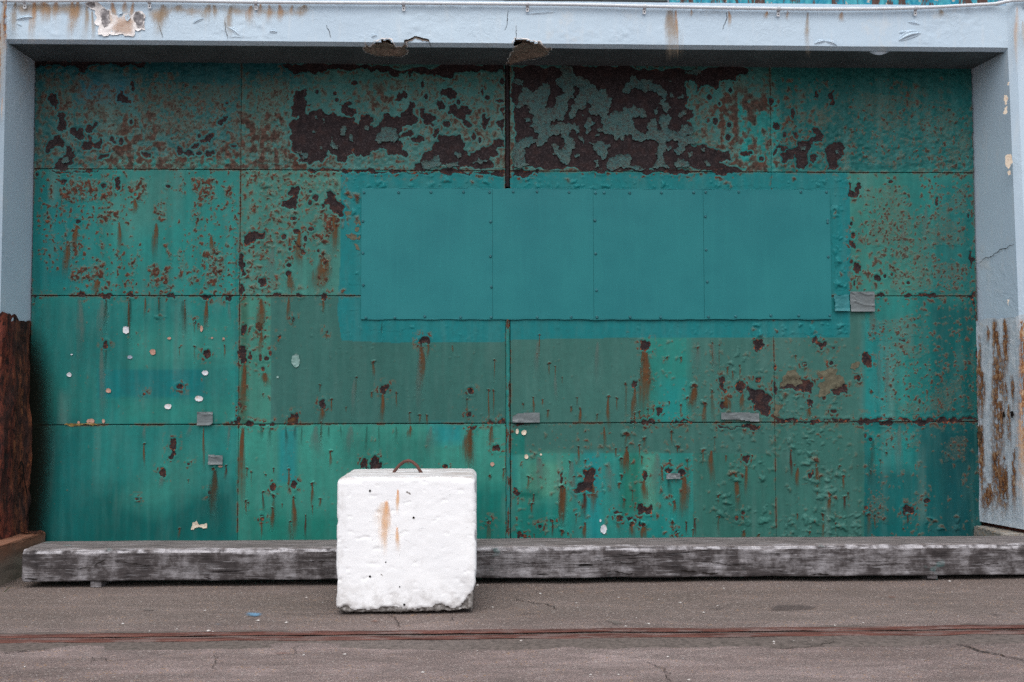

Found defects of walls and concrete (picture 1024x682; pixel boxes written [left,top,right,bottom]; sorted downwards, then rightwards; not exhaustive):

peeling [85,2,146,36]
rust [74,77,241,143]
peeling [282,36,846,178]
rust [178,176,236,221]
rust [46,177,188,308]
rust [201,236,227,288]
rust [887,235,970,294]
rust [865,314,934,394]
rust [464,429,472,456]
rust [668,380,743,415]
rust [938,319,1024,507]
rust [383,490,399,540]